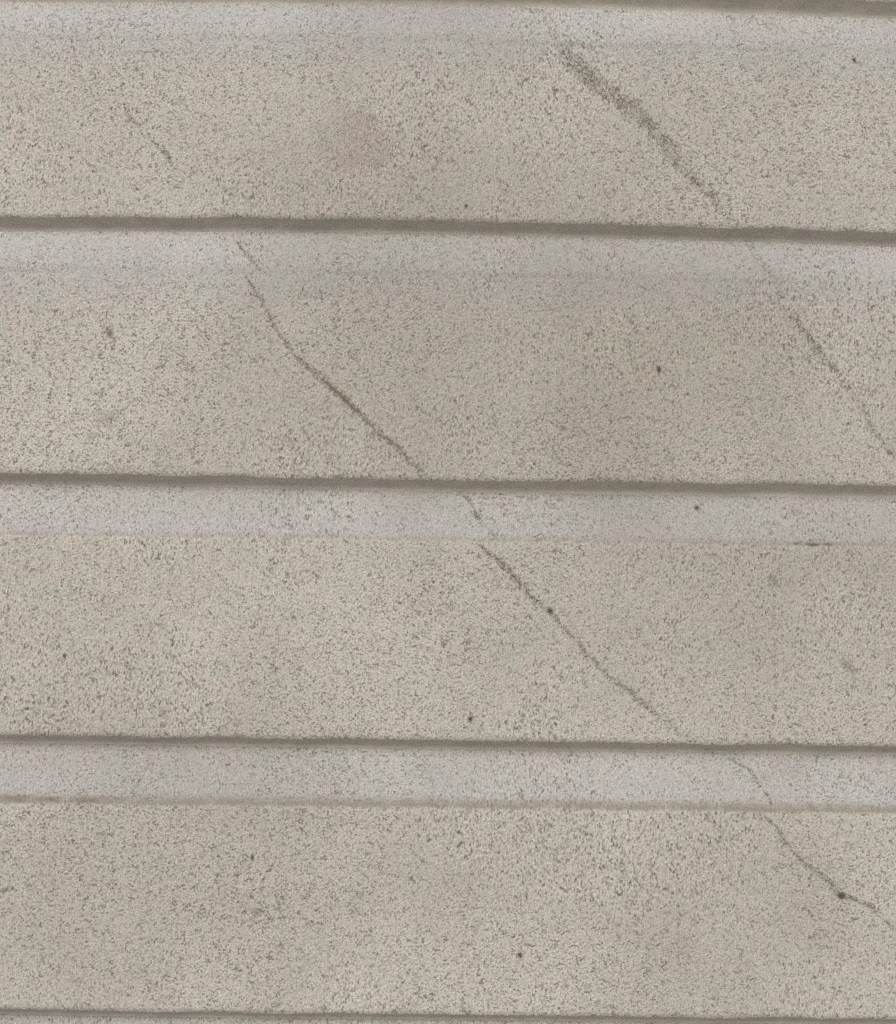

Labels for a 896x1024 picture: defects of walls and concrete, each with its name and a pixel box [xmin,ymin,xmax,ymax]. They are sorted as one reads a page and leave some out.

crack [551,35,727,220]
crack [239,242,423,472]
crack [744,241,891,452]
crack [456,492,678,731]
crack [712,752,893,926]